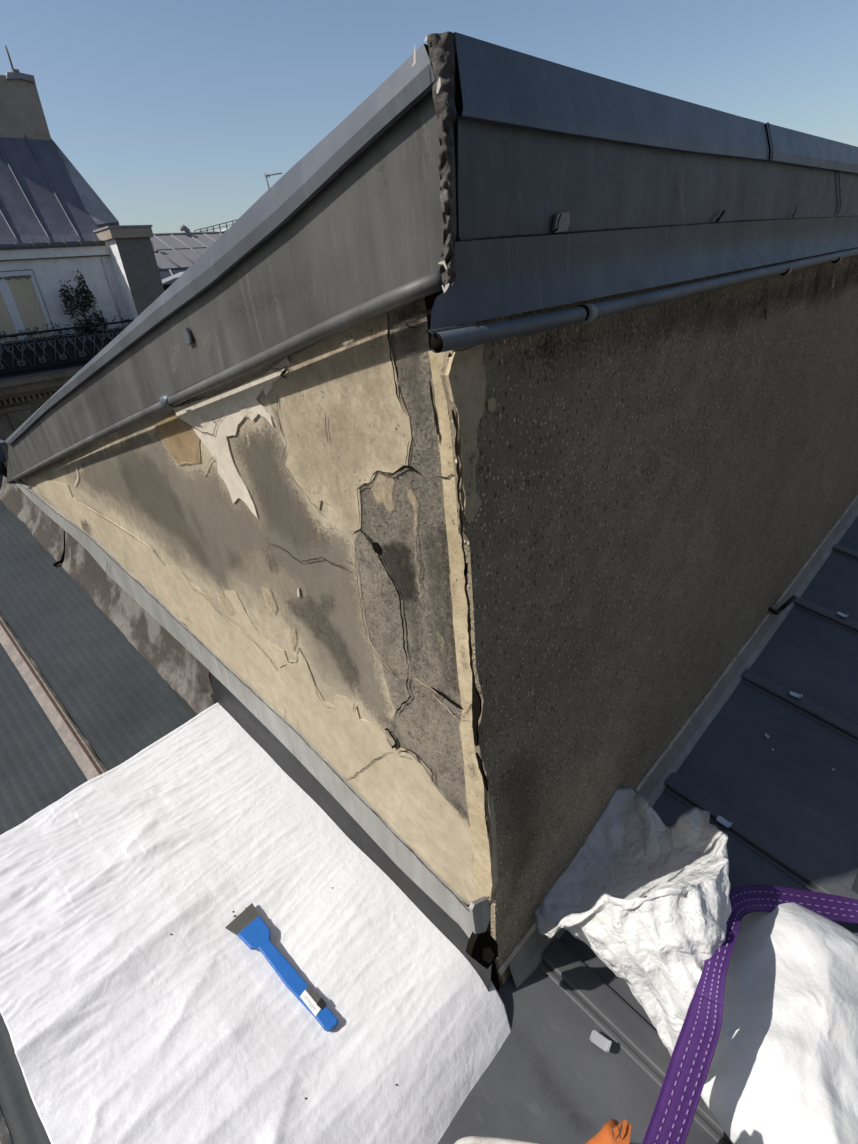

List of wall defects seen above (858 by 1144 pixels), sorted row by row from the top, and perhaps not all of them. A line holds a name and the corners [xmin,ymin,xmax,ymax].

leakage [81,428,394,736]
flaking render [31,299,477,903]
crack [264,290,489,836]